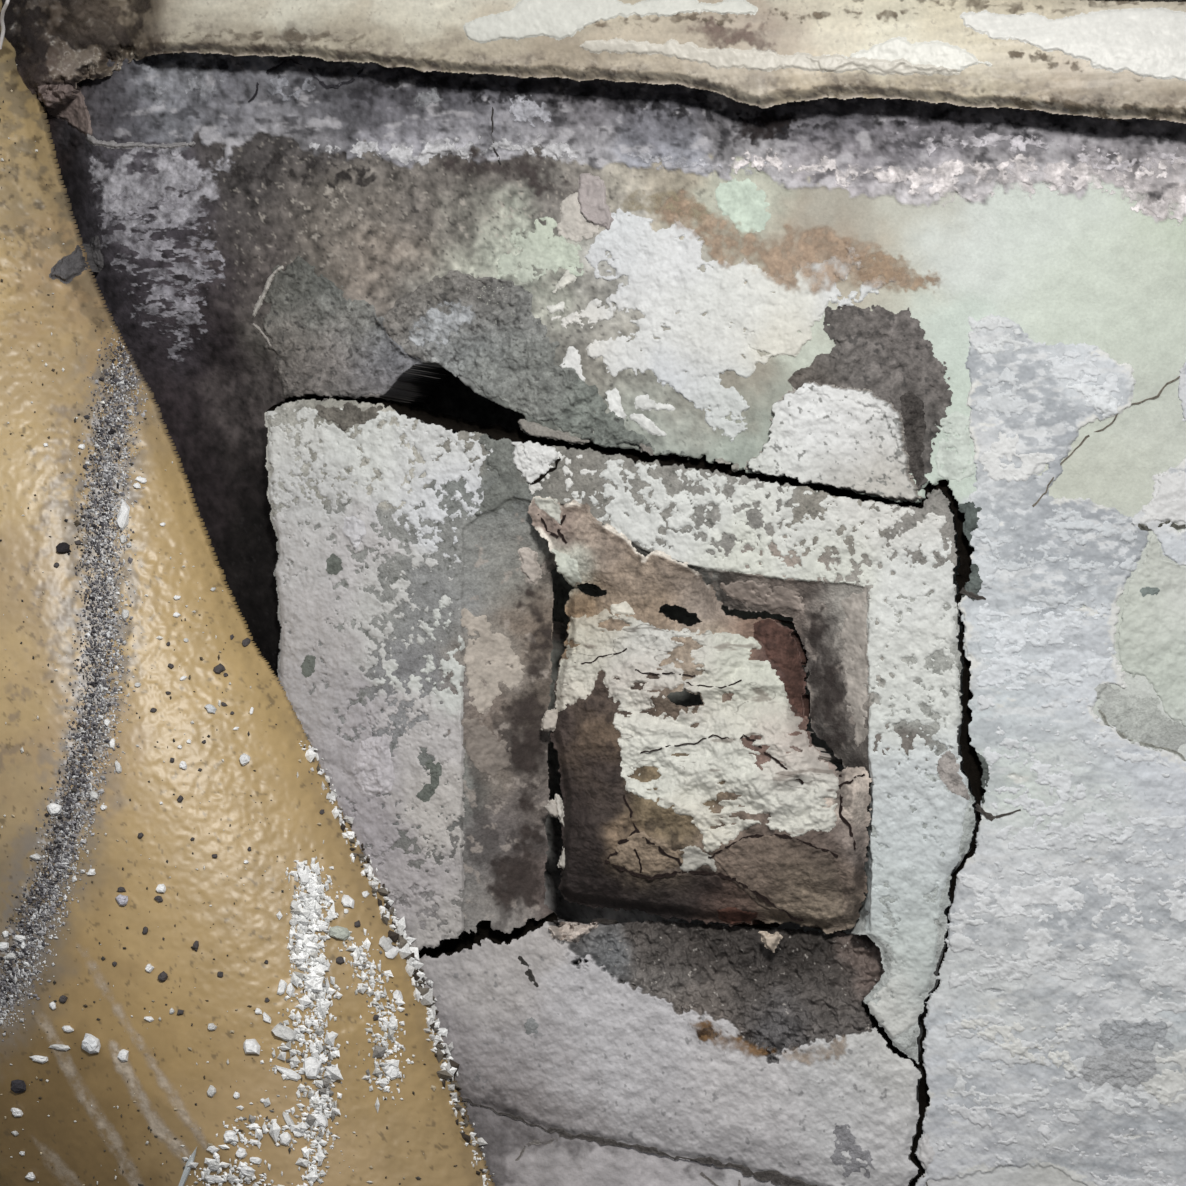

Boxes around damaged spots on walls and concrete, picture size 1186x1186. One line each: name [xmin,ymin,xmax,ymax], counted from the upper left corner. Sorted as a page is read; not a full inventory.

water stain [179,54,229,98]
water stain [268,61,338,100]
water stain [675,12,732,25]
peeling [463,0,992,76]
water stain [1009,51,1078,70]
peeling [960,7,1186,81]
water stain [628,98,1186,223]
water stain [89,68,595,361]
water stain [518,589,567,677]
peeling [252,173,1186,1186]
water stain [488,694,545,907]
crack [266,394,1021,1186]